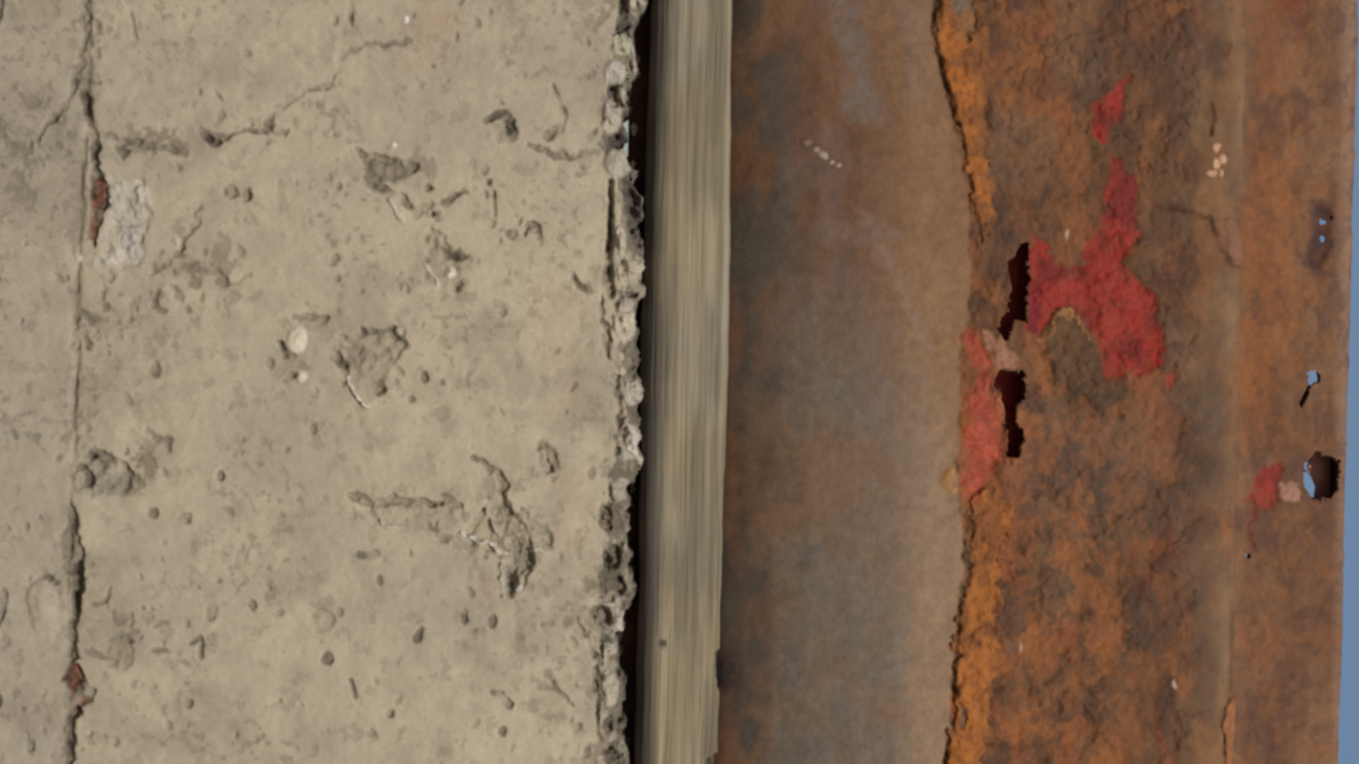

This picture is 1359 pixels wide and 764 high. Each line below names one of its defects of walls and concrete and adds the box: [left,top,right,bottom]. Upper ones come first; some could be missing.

crack [65,265,119,434]
crack [32,0,415,182]
spalling [342,0,650,764]
rust [930,0,1007,246]
peeling [937,323,1022,508]
rust [1030,307,1141,420]
peeling [1021,70,1181,395]
rust [1227,119,1340,461]
crack [44,495,90,764]
rust [945,487,1016,764]
rust [1217,694,1238,764]